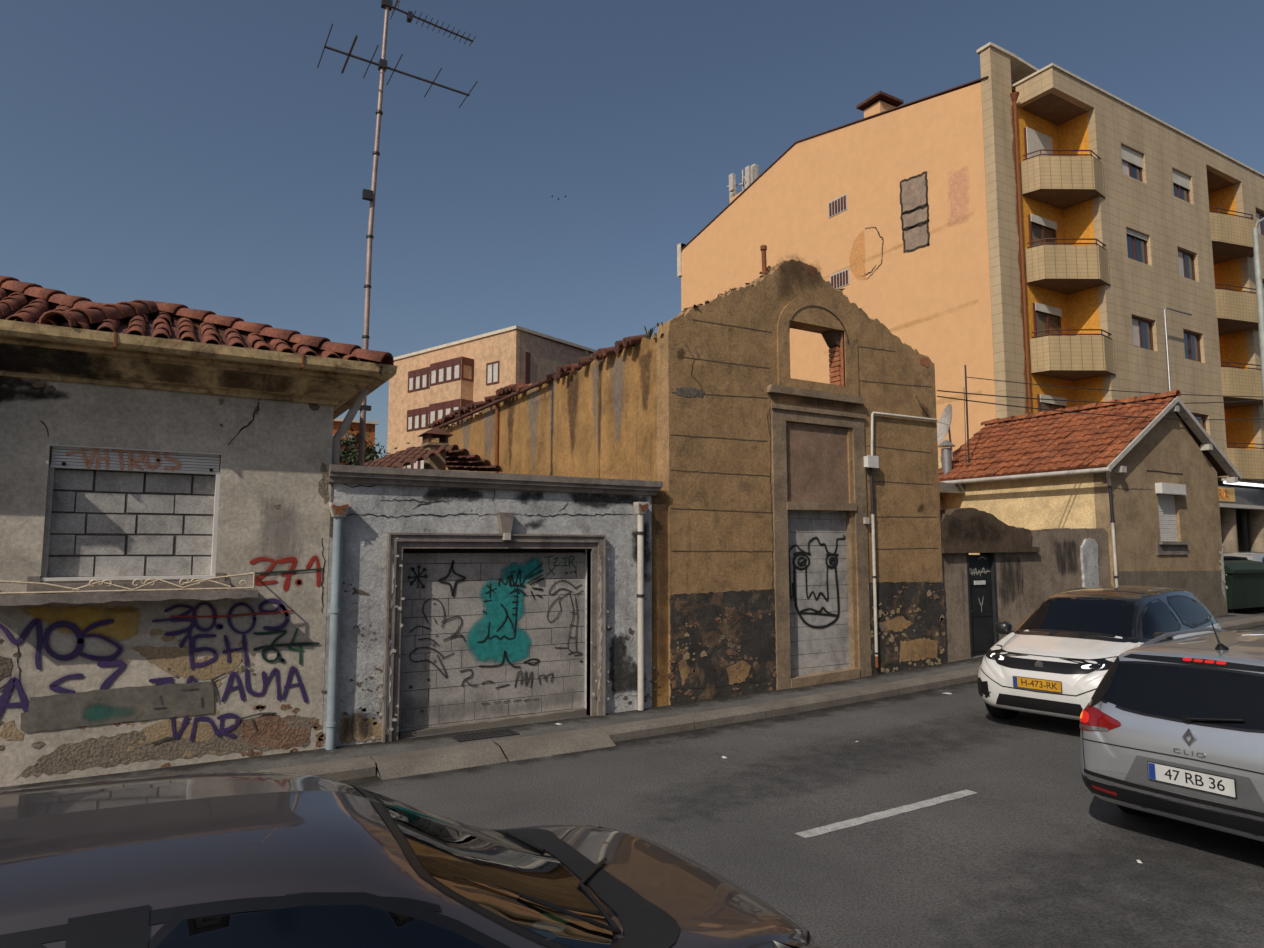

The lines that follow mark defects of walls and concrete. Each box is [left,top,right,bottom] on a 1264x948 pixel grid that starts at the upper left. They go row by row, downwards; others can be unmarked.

crack [228,399,260,445]
flaking render [0,538,405,778]
peeling [590,546,777,704]
peeling [870,584,945,673]